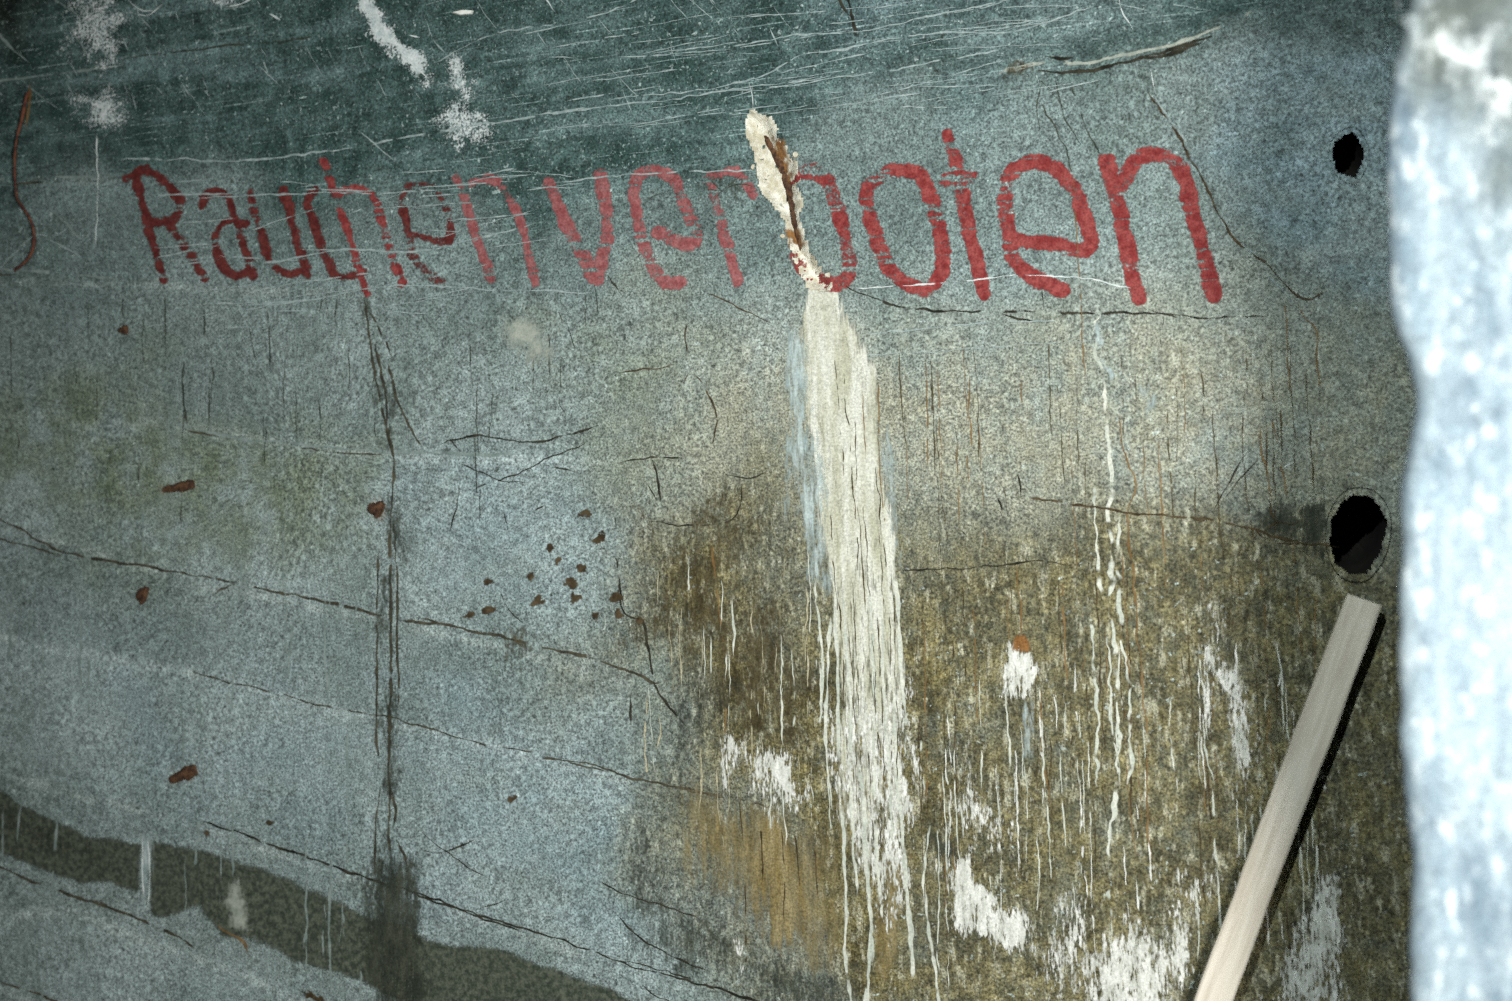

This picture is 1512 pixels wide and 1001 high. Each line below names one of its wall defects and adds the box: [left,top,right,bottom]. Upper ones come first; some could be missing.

crack [839,0,857,42]
crack [711,294,769,322]
crack [443,425,598,532]
crack [620,325,763,527]
crack [608,517,686,726]
damp [618,283,1294,1001]
damp [380,692,400,788]
damp [0,725,630,1001]
crack [421,831,503,908]
crack [602,882,709,971]